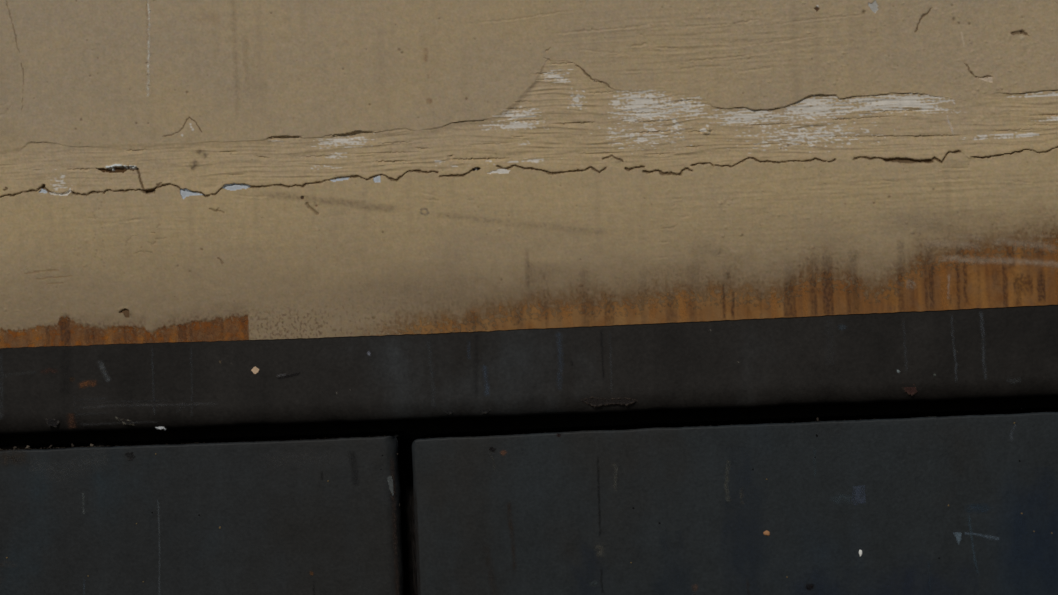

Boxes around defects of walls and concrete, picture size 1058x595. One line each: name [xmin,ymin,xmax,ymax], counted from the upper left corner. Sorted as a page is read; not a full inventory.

peeling [0,58,1058,216]
crack [0,146,1058,198]
corrosion [398,233,1058,335]